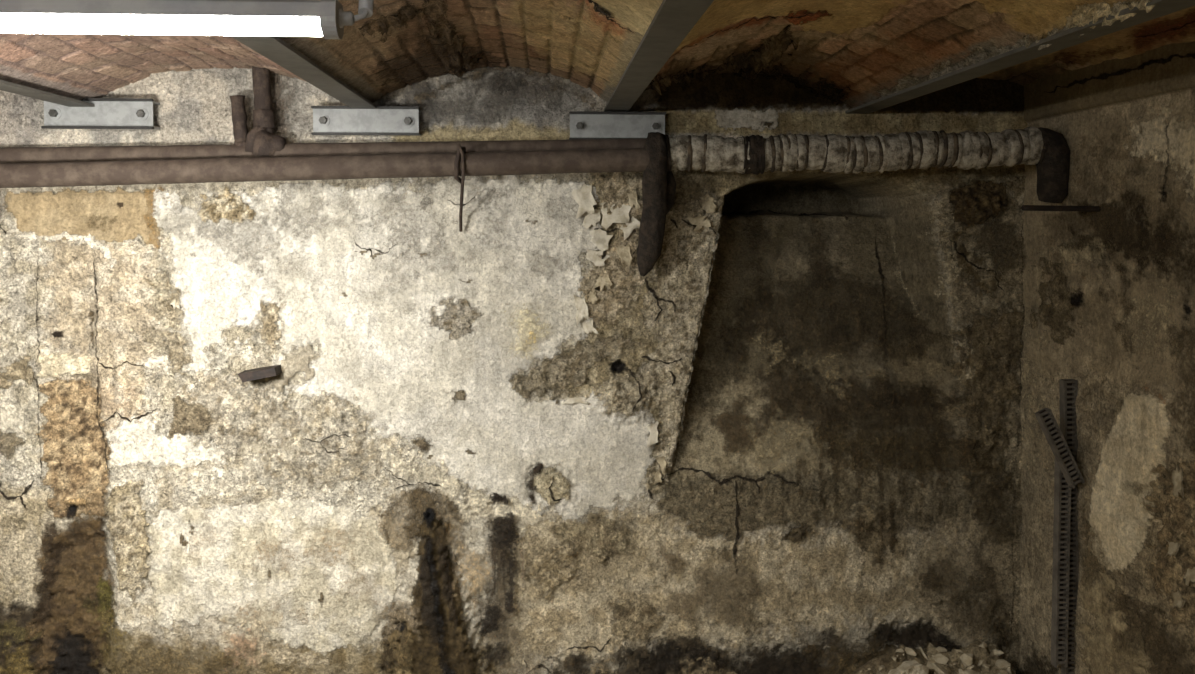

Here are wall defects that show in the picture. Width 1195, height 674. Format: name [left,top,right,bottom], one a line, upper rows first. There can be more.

spalling [650,9,844,105]
spalling [877,0,1155,98]
crack [1047,21,1195,93]
damp [1065,191,1195,352]
peeling [0,172,824,667]
damp [376,214,1026,674]
crack [648,467,796,573]
damp [0,512,266,674]
damp [1107,592,1194,674]